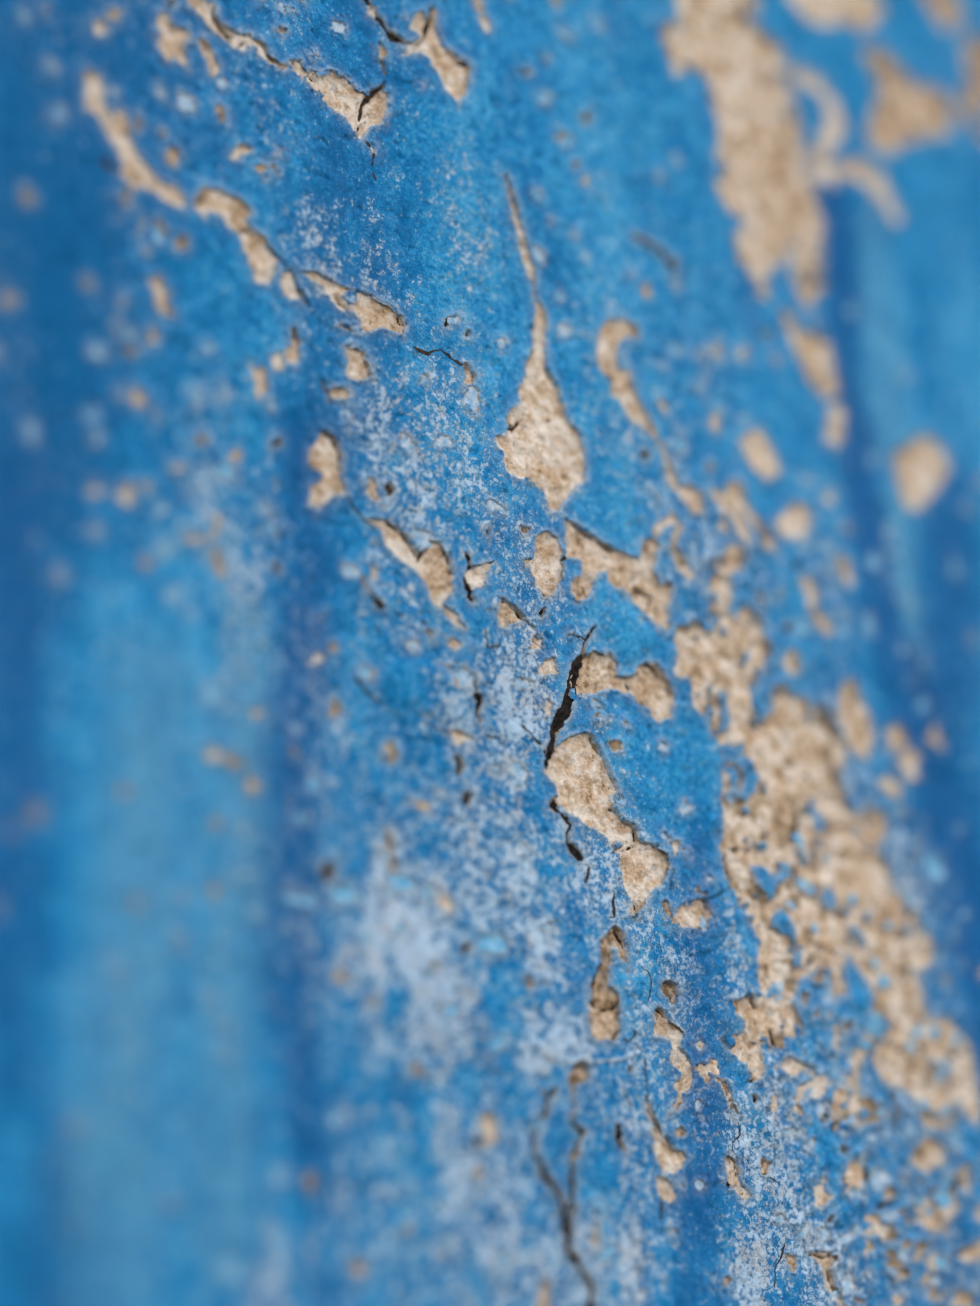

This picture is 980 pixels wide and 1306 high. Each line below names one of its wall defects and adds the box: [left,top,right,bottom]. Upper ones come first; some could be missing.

peeling [156,0,474,152]
peeling [474,0,490,32]
peeling [660,0,980,307]
peeling [84,72,404,399]
peeling [364,478,393,501]
peeling [368,519,521,650]
peeling [451,730,473,775]
crack [354,553,616,918]
peeling [494,177,980,1306]
crack [641,942,662,1001]
crack [615,1029,648,1152]
crack [531,1087,597,1306]